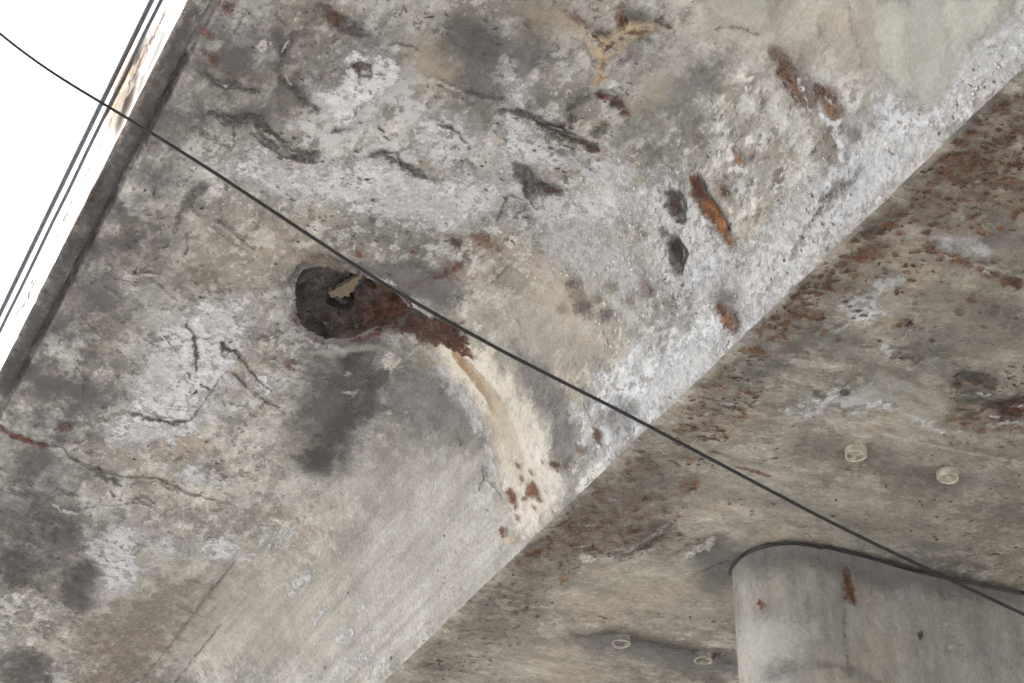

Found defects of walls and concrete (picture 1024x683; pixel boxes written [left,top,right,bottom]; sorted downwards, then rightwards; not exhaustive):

rust [560,1,672,116]
rust [767,46,846,155]
spalling [288,261,413,340]
spalling [511,162,565,219]
damp [218,0,1024,540]
spalling [658,191,687,278]
crack [129,323,272,426]
rust [417,85,1024,682]
crack [0,426,232,515]